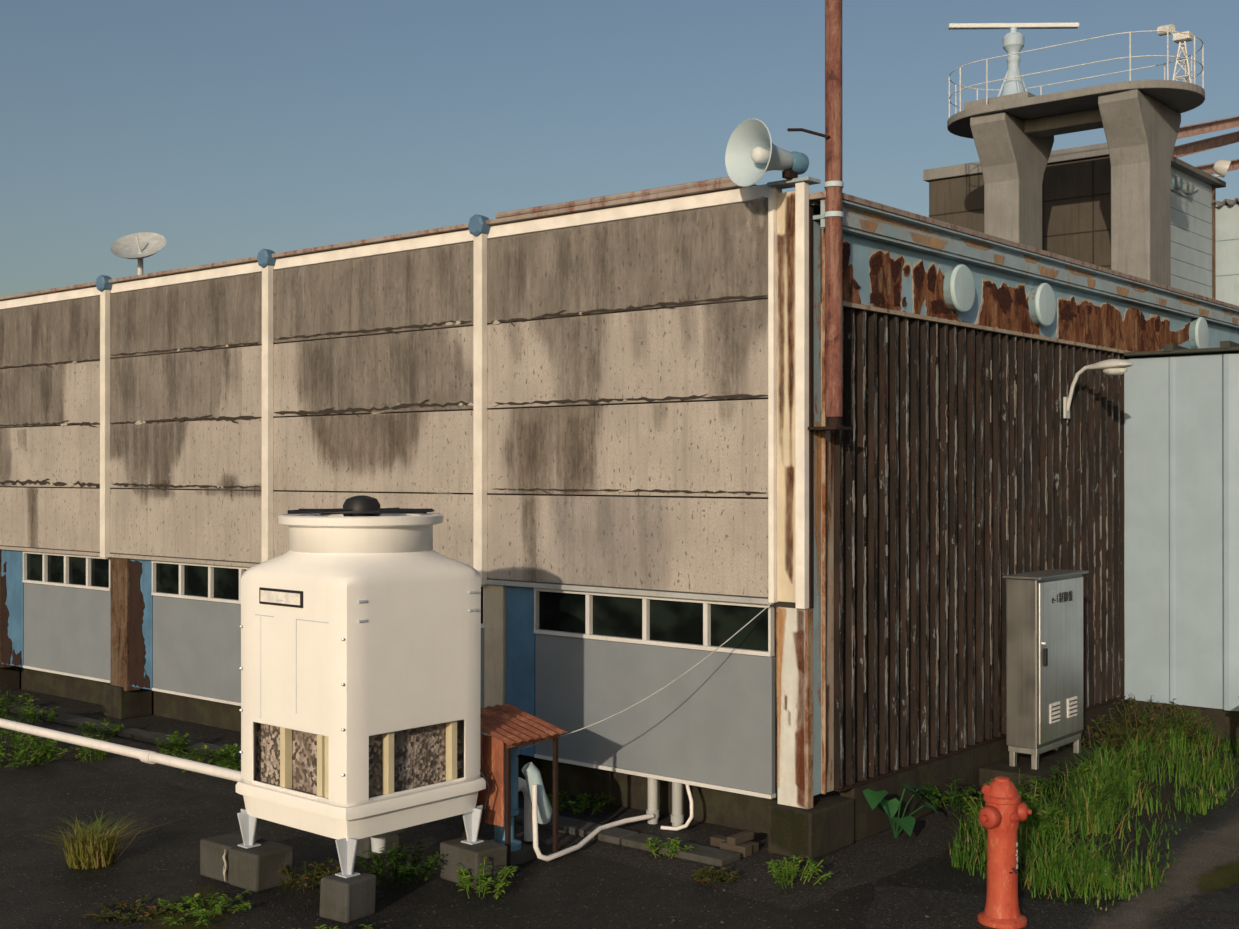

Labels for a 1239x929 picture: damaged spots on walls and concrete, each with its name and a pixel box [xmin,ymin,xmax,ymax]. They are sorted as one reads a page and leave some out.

damp [0,273,276,427]
damp [297,253,471,466]
rust [777,194,795,424]
rust [842,208,1209,352]
damp [222,478,262,495]
rust [786,467,794,581]
rust [814,422,833,623]
rust [777,609,805,808]